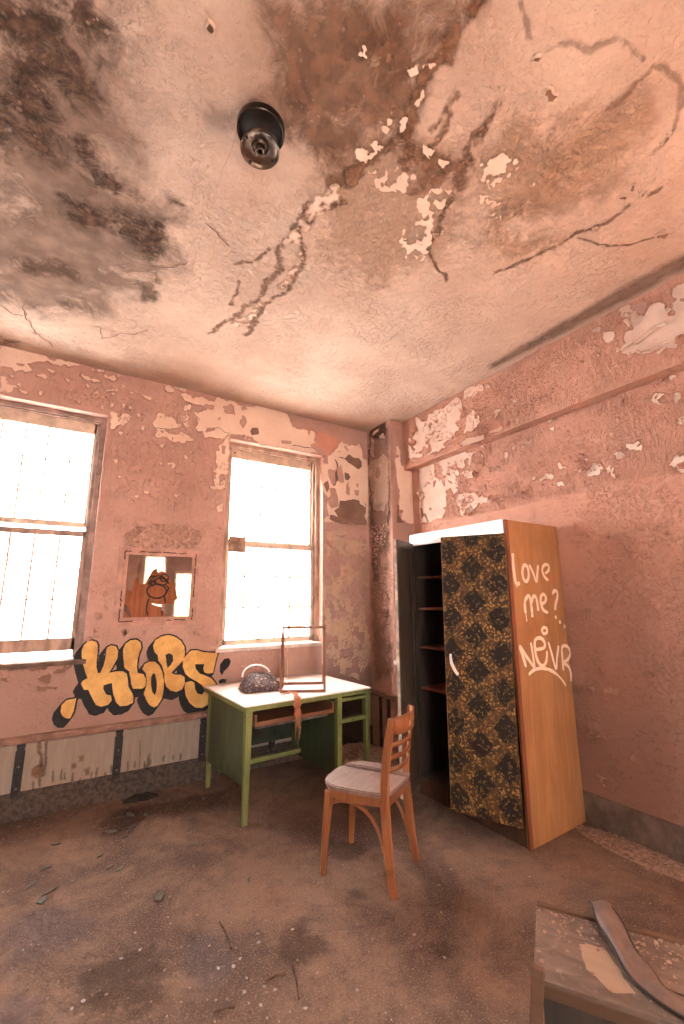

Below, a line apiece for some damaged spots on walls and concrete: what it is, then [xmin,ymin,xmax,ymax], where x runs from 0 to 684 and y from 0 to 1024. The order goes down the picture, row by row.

water stain [0,0,172,313]
water stain [209,200,347,336]
spalling [272,183,341,292]
water stain [261,0,501,281]
spalling [355,117,416,194]
spalling [399,187,452,261]
spalling [422,145,449,168]
spalling [476,149,519,220]
water stain [495,204,654,273]
peeling [579,282,684,370]
peeling [0,345,644,526]
water stain [370,422,386,438]